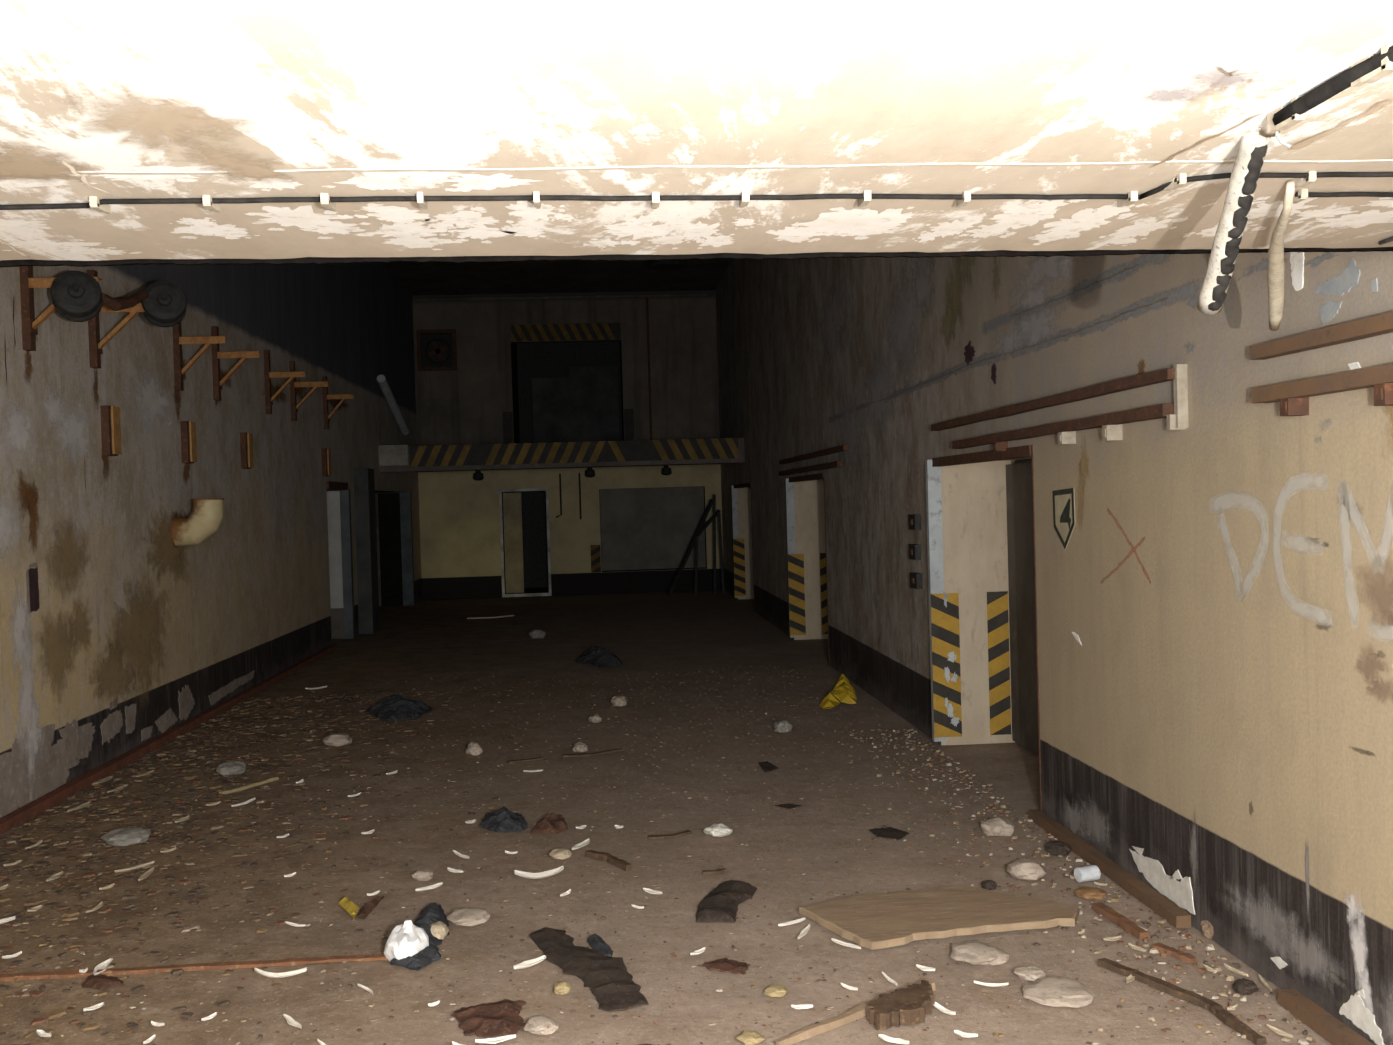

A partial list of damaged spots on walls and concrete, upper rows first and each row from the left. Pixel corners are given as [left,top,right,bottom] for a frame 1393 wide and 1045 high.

peeling [0,166,207,188]
peeling [170,173,578,250]
peeling [583,194,1219,250]
peeling [1244,196,1393,232]
leakage [6,391,89,462]
leakage [96,516,185,698]
leakage [13,524,89,801]
peeling [0,670,255,818]
peeling [86,847,176,913]
spalling [1129,846,1195,915]
spalling [1270,957,1288,969]
spalling [1339,989,1385,1045]